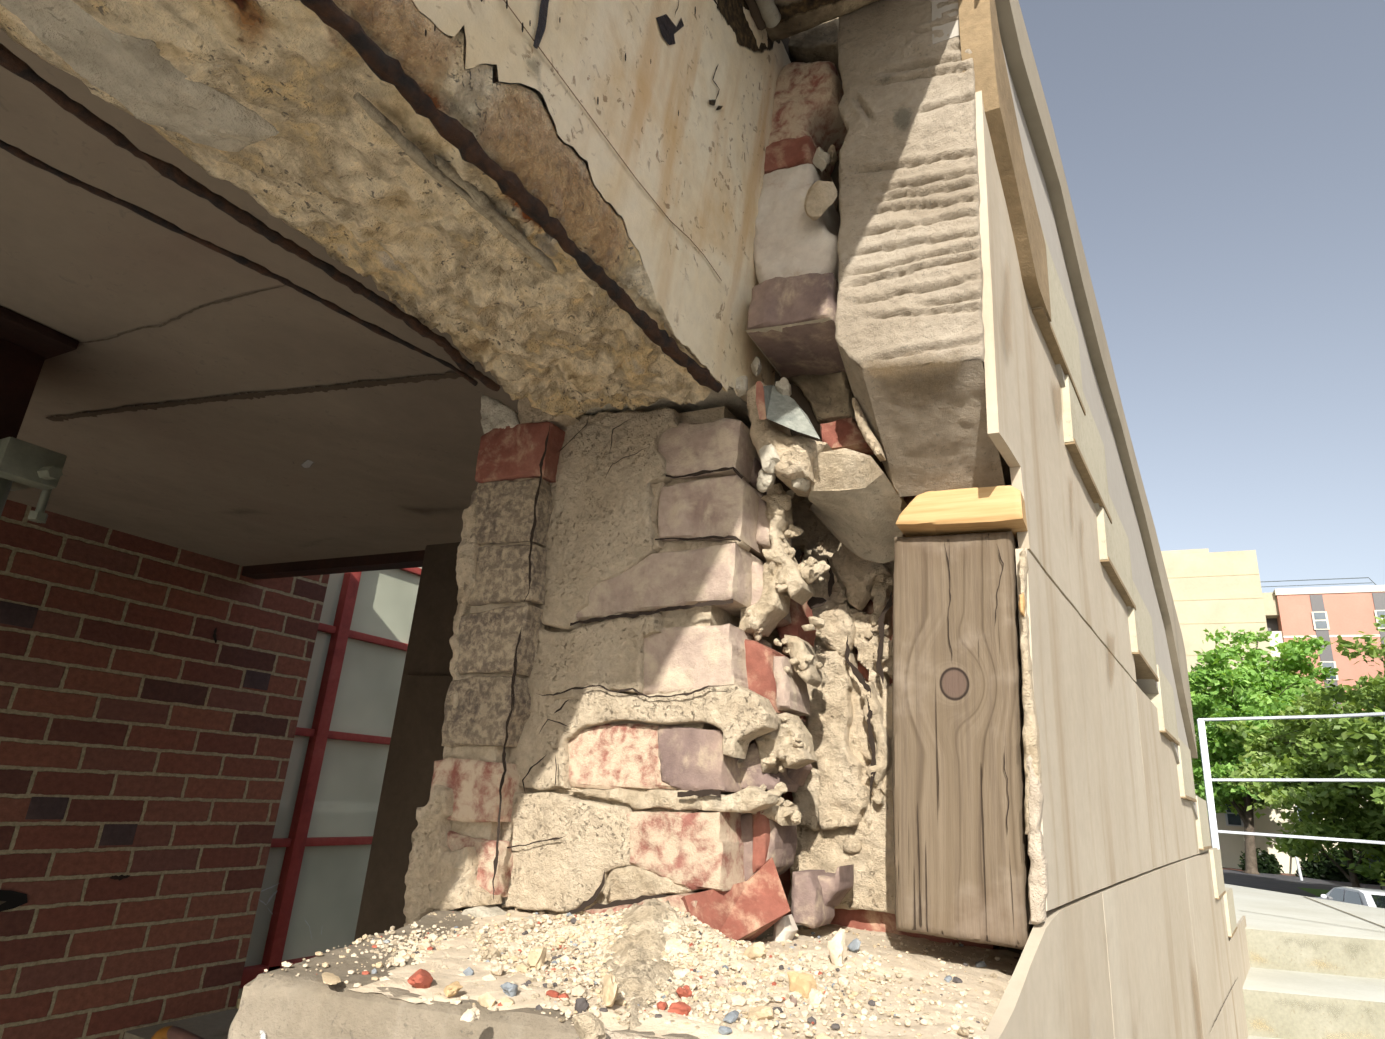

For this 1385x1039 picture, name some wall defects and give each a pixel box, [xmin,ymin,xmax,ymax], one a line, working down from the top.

crack [79,285,285,343]
rust [223,0,267,42]
spalling [0,0,731,418]
crack [492,416,744,900]